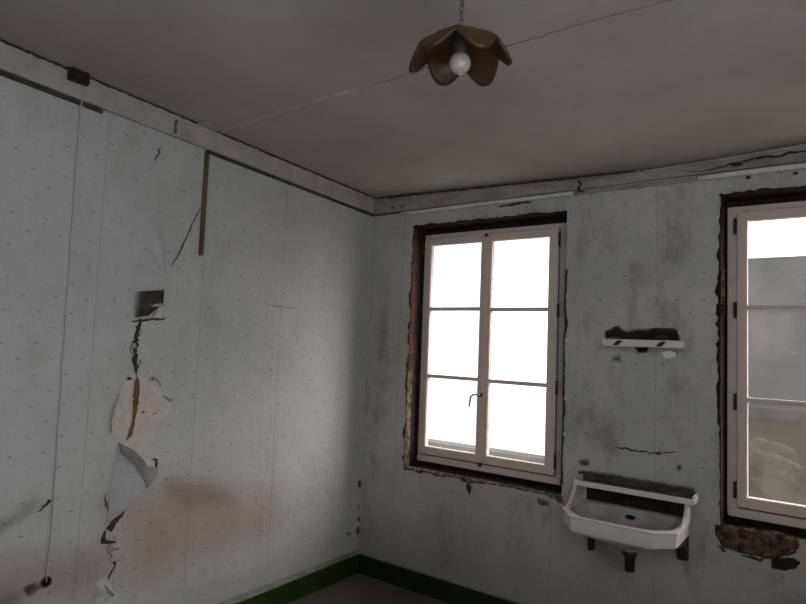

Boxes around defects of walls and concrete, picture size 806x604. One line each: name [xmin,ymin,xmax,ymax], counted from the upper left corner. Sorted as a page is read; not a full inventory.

crack [0,39,68,70]
crack [90,77,197,134]
crack [216,131,650,207]
crack [688,150,806,172]
crack [170,208,201,273]
crack [130,317,166,375]
spalling [402,211,567,506]
flaking render [605,326,680,353]
spalling [714,185,806,575]
flaking render [108,375,175,524]
crack [616,447,680,455]